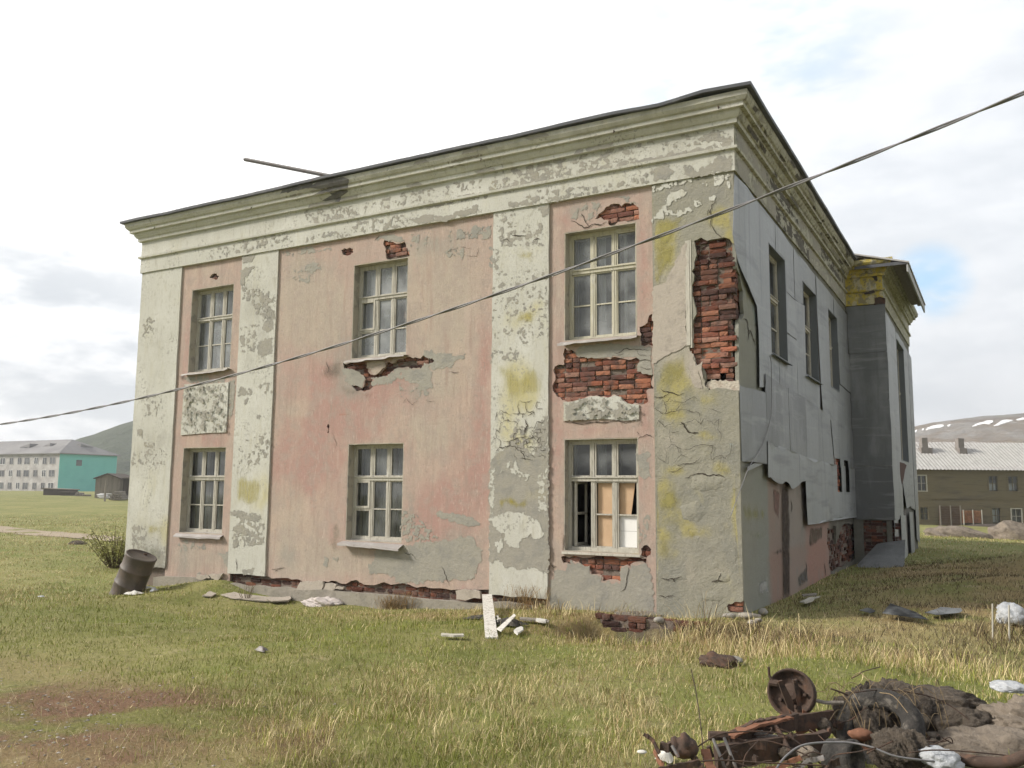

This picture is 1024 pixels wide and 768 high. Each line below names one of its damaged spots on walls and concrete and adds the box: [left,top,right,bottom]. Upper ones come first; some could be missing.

peeling [207,106,850,364]
flaking render [690,238,740,390]
peeling [181,374,273,434]
peeling [239,433,271,465]
peeling [342,349,466,404]
flaking render [553,315,653,421]
crack [493,390,732,478]
peeling [218,510,264,567]
peeling [368,415,654,612]
flaking render [827,520,901,571]